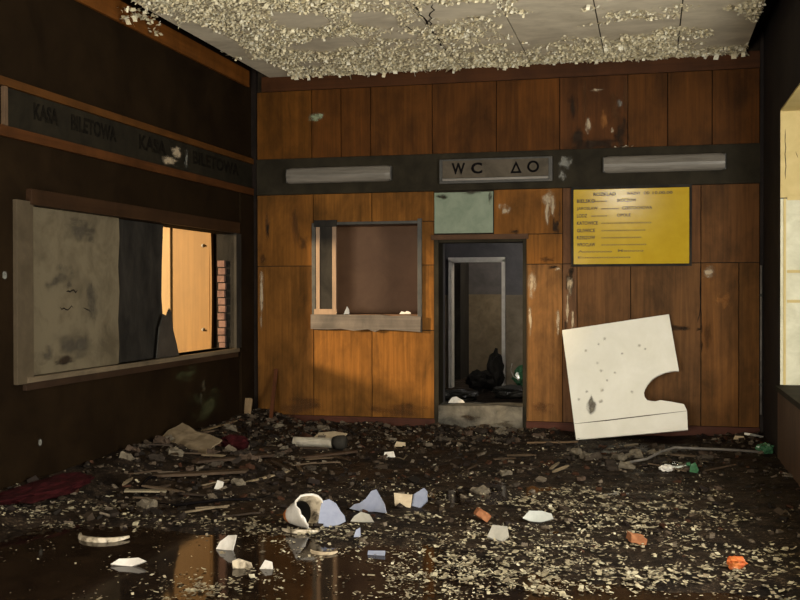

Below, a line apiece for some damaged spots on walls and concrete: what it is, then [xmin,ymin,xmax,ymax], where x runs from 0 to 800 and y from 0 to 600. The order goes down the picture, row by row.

crack [406,4,451,57]
peeling [121,0,749,81]
peeling [721,0,766,23]
peeling [550,265,574,330]